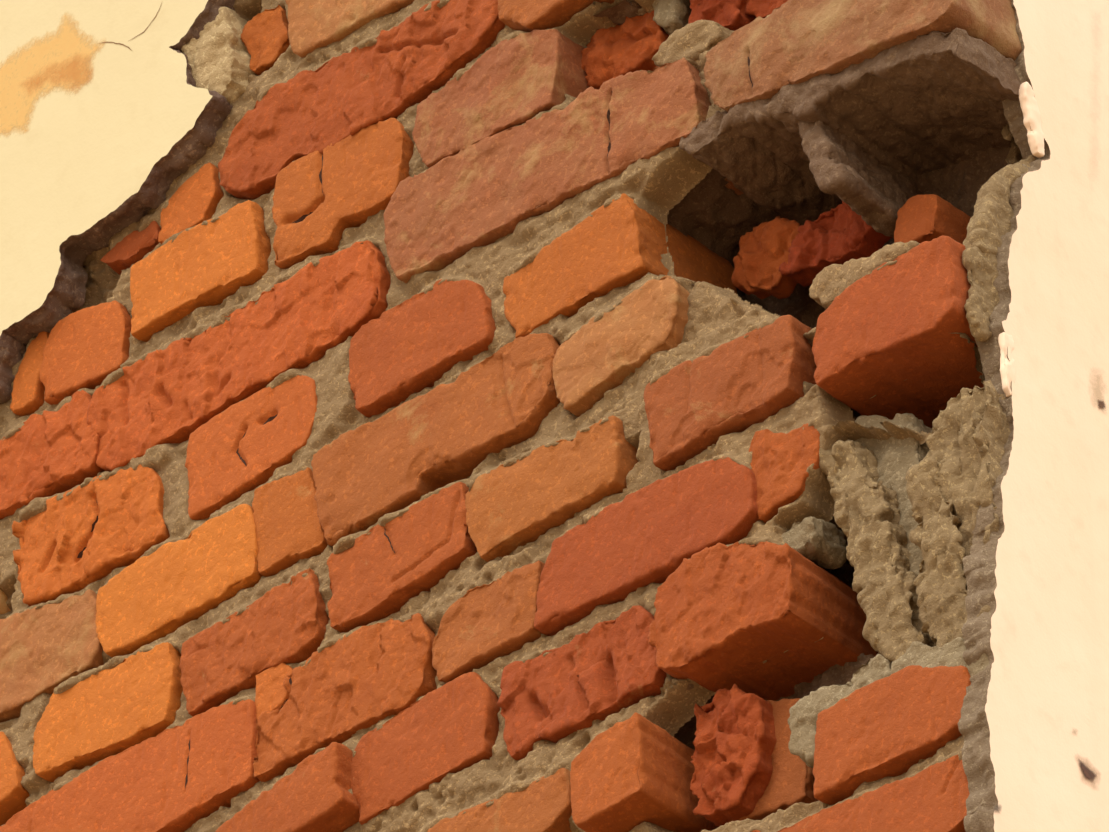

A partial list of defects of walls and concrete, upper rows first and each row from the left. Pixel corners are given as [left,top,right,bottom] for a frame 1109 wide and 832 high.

crack [99,3,162,50]
spalling [0,0,615,441]
spalling [383,0,1045,286]
spalling [0,146,1011,832]
spalling [998,332,1016,398]